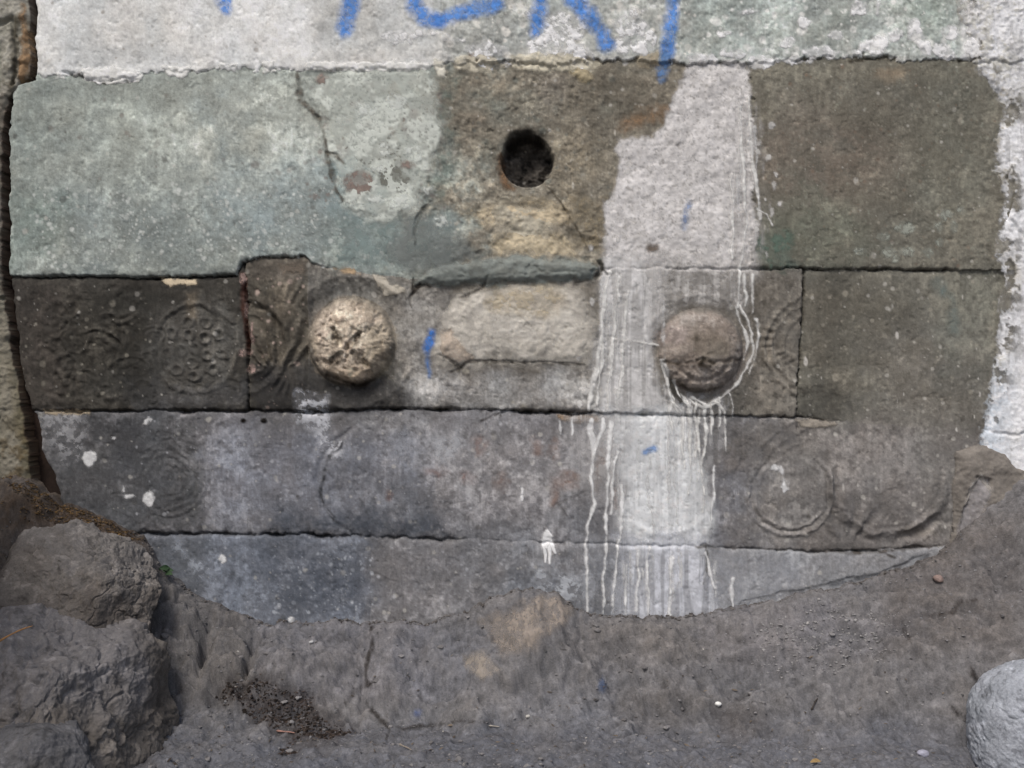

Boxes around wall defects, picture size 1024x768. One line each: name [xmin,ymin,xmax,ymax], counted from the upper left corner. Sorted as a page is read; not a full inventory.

crack [296,73,344,199]
damp [537,270,654,615]